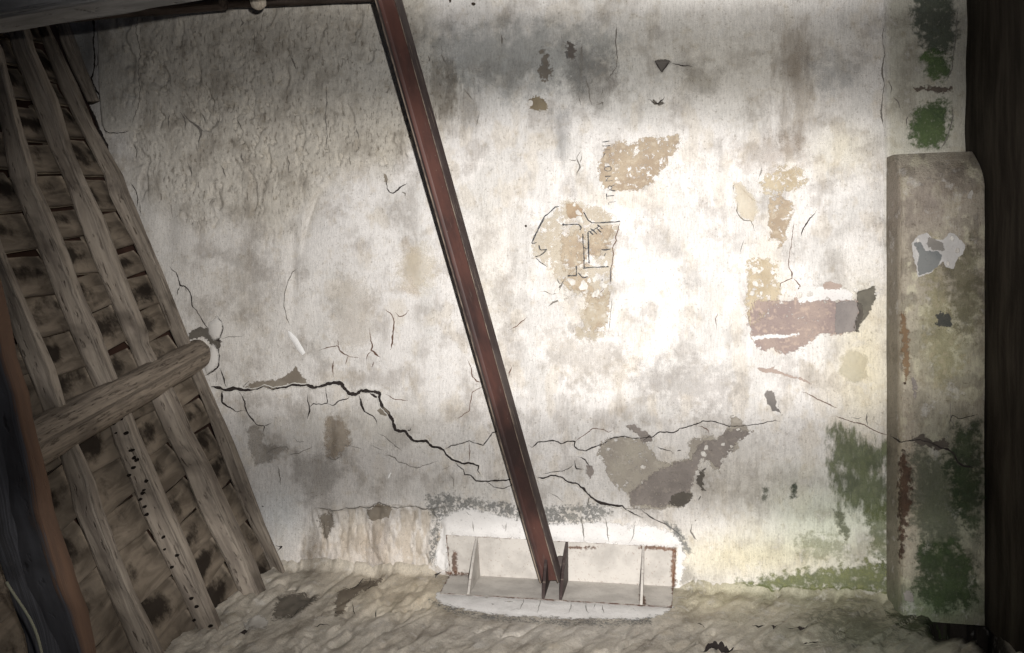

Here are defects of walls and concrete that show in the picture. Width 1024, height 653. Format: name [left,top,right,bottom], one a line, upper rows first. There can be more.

crack [880,25,909,126]
spalling [598,134,682,191]
spalling [759,164,807,248]
spalling [525,201,618,341]
peeling [745,258,880,355]
peeling [911,233,965,277]
spalling [245,366,307,390]
crack [169,266,512,511]
crack [533,420,776,542]
spalling [586,415,754,510]
crack [804,392,974,468]
rust [896,449,913,564]